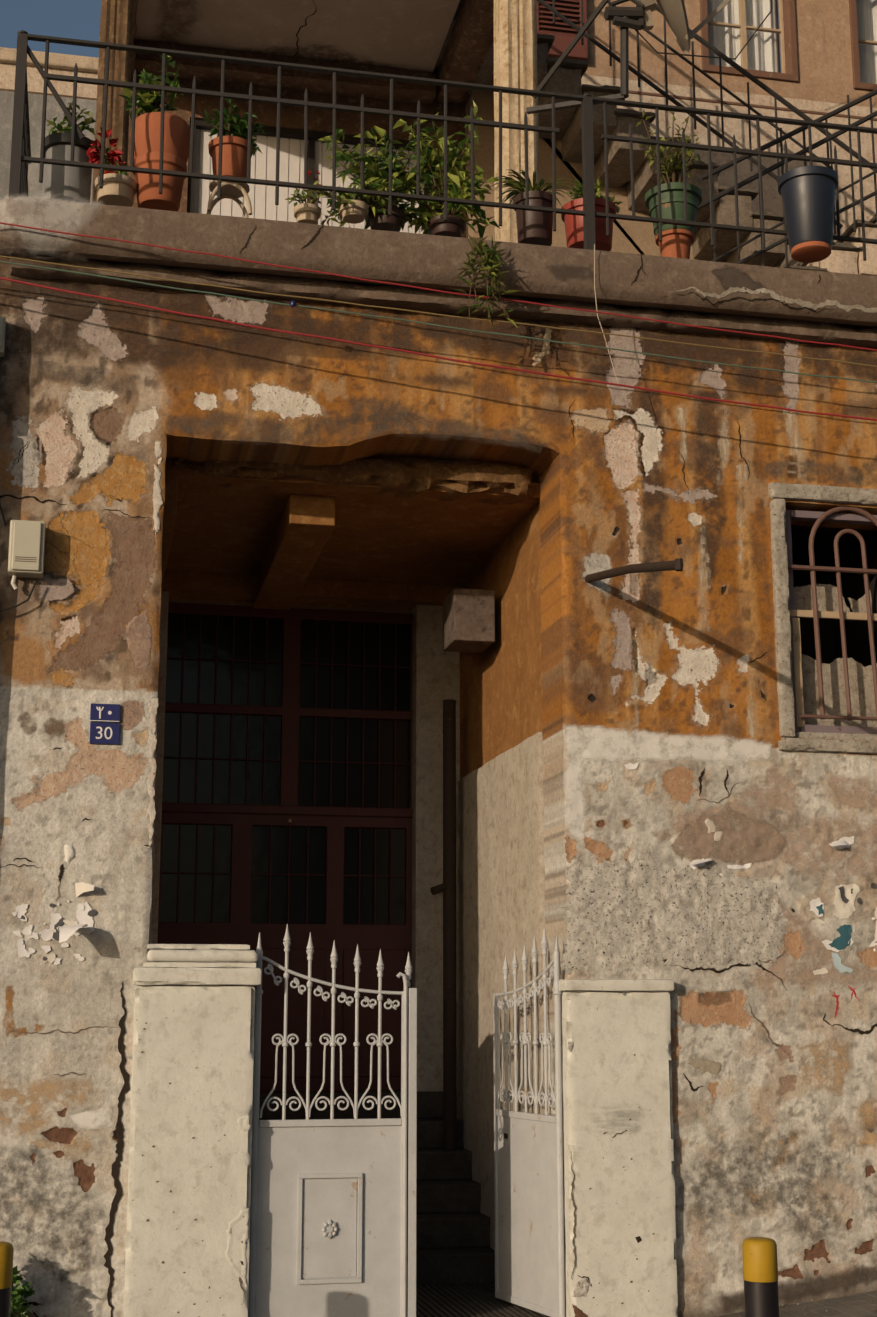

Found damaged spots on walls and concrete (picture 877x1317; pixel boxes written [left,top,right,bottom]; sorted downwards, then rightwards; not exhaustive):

crack [294,0,317,58]
peeling [699,364,726,400]
flaking render [6,386,163,687]
peeling [569,326,719,726]
spalling [643,764,802,864]
spalling [677,929,806,991]
spalling [679,988,849,1095]
crack [823,1013,877,1035]
peeling [0,1081,118,1192]
crack [8,981,130,1317]
spalling [778,1239,831,1280]
spalling [855,1239,874,1255]